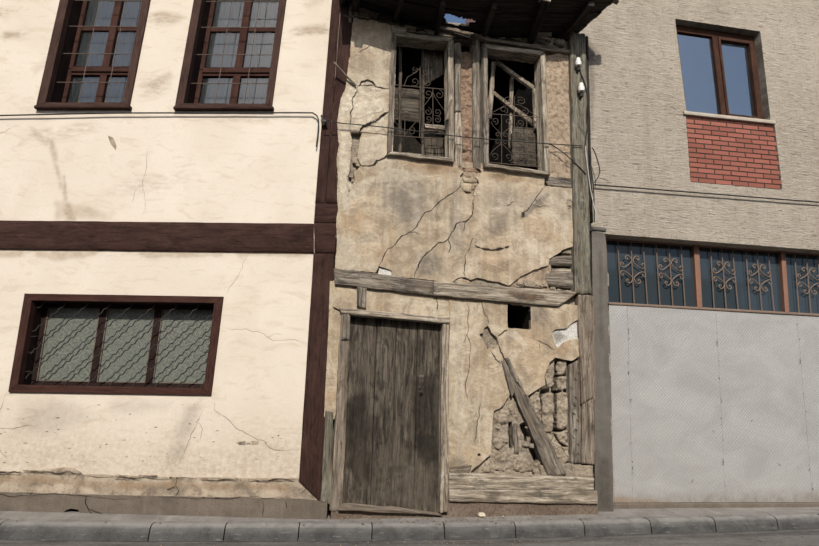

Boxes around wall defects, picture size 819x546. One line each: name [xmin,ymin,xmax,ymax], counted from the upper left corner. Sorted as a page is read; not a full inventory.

crack [349,79,389,135]
crack [361,154,387,167]
crack [377,176,509,277]
spalling [454,248,573,291]
spalling [480,327,497,349]
spalling [552,320,577,347]
crack [464,301,523,439]
spalling [449,357,593,477]
crack [2,475,115,514]
crack [140,477,238,499]